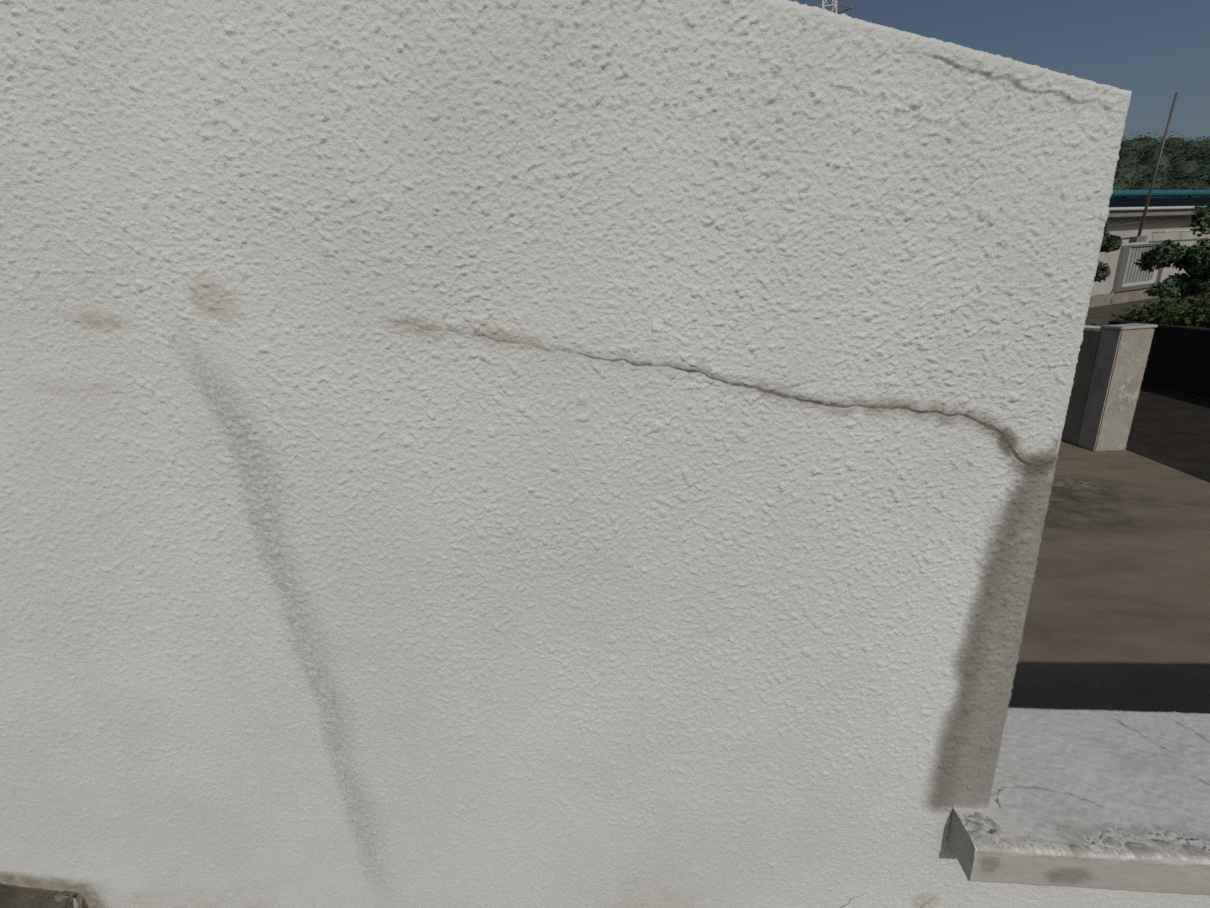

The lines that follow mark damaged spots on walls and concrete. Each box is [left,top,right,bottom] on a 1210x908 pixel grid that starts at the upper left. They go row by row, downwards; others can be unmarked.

crack [591,357,850,407]
crack [906,407,1055,471]